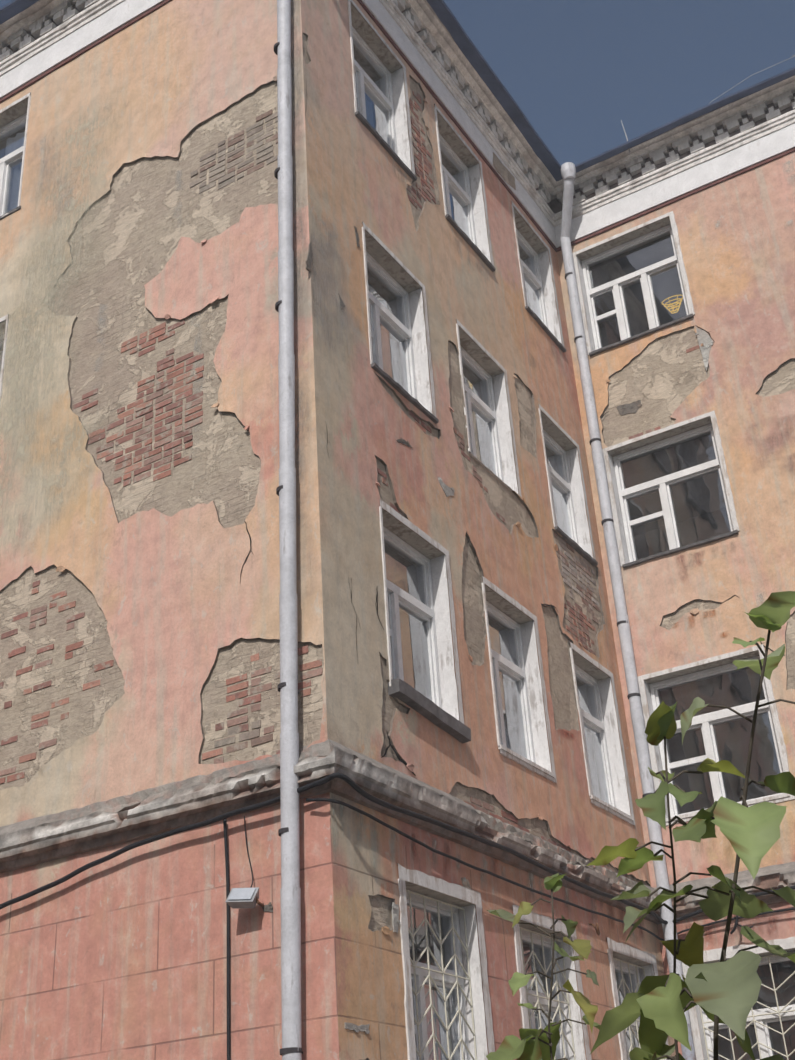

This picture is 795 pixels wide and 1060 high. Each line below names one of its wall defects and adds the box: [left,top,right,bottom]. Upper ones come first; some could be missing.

flaking render [406,75,440,232]
flaking render [42,76,278,528]
flaking render [375,340,539,538]
flaking render [600,326,714,450]
flaking render [0,564,125,790]
flaking render [198,638,281,764]
flaking render [298,642,324,748]
crack [381,732,416,776]
flaking render [461,532,487,666]
flaking render [541,529,605,731]
flaking render [660,599,723,630]
flaking render [449,782,651,886]